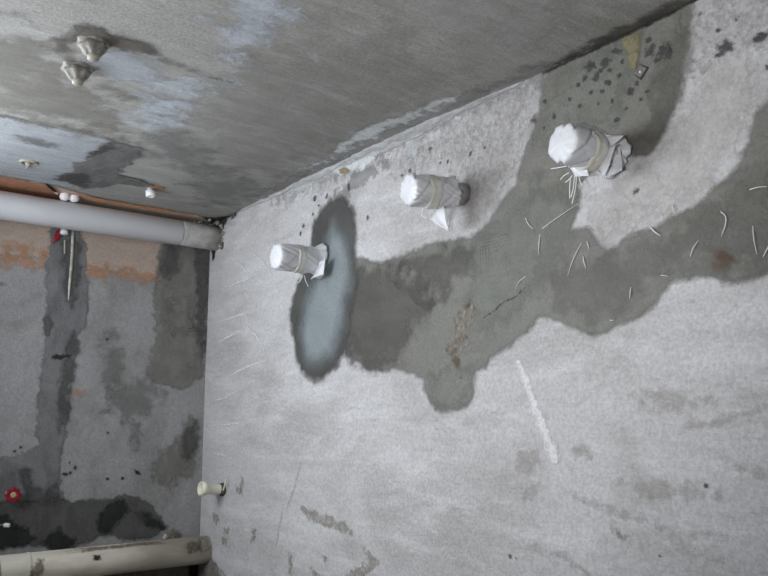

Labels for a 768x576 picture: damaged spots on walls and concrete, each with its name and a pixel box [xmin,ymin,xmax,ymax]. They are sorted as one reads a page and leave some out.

corrosion [0,220,55,270]
leakage [0,228,166,550]
corrosion [0,176,211,224]
corrosion [79,231,164,284]
leakage [0,26,263,205]
leakage [151,417,201,486]
leakage [103,243,264,443]
leakage [290,0,768,411]